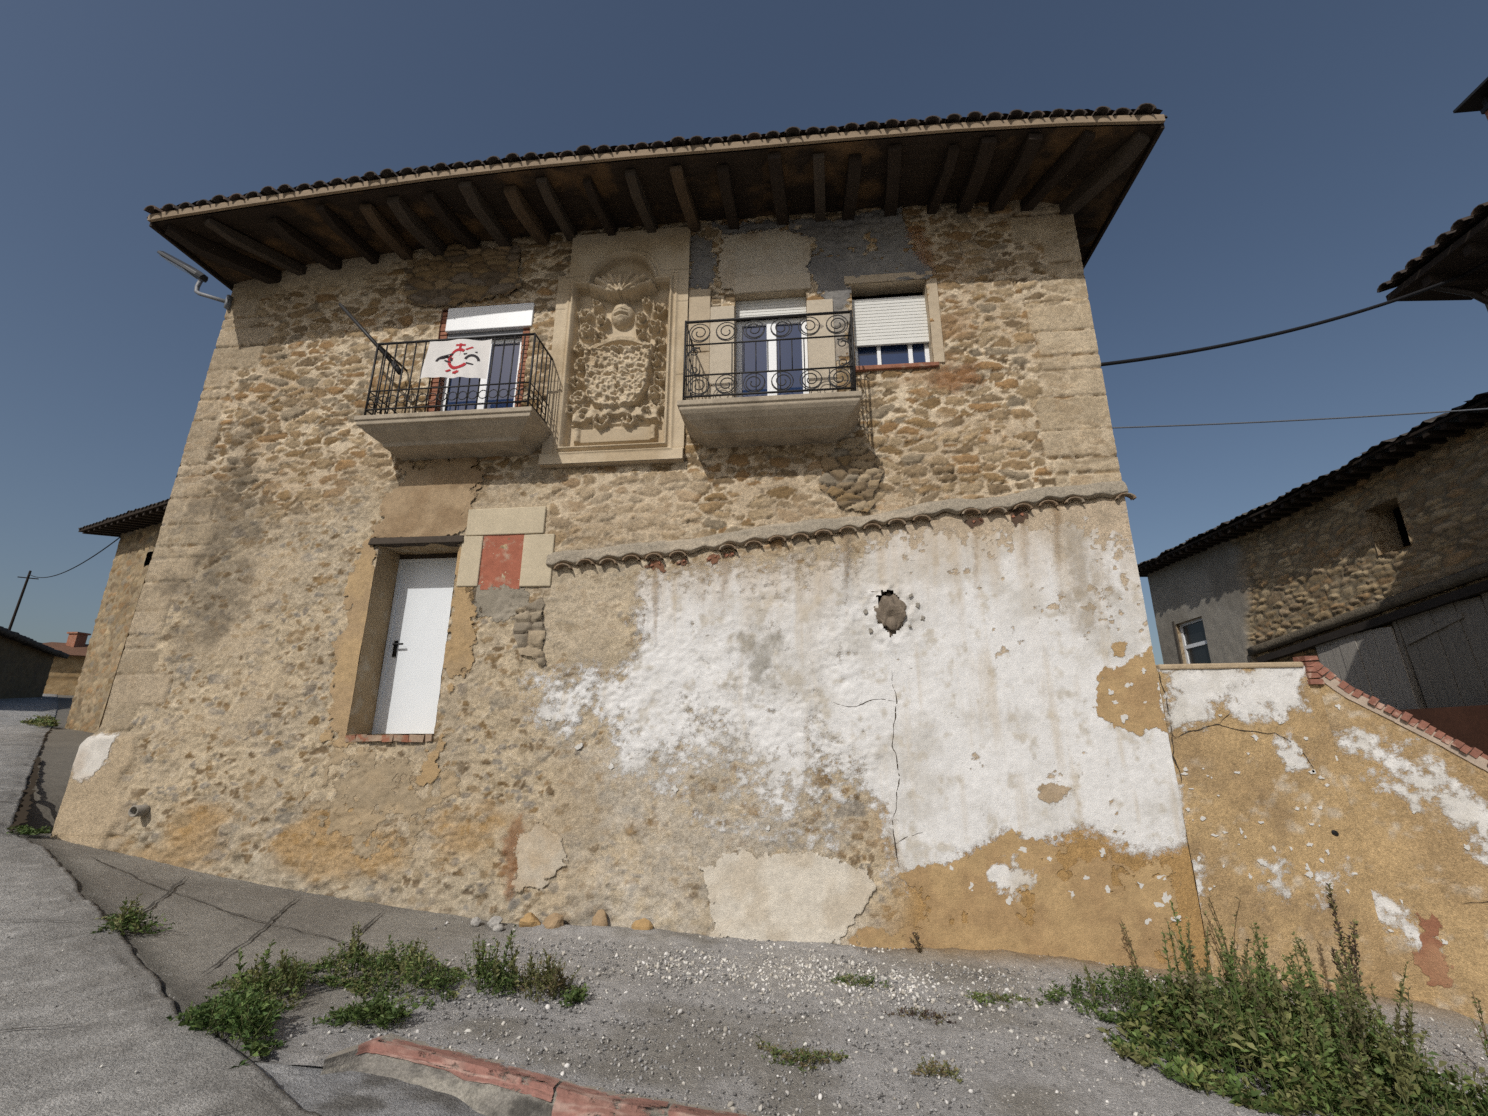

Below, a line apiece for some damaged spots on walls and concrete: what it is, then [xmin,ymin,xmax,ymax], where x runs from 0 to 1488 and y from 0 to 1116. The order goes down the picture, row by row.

peeling [71,732,119,783]
crack [836,670,918,866]
peeling [524,508,1329,971]
crack [1158,668,1313,782]
peeling [1334,726,1488,864]
peeling [1248,806,1358,907]
spalling [1371,890,1454,988]